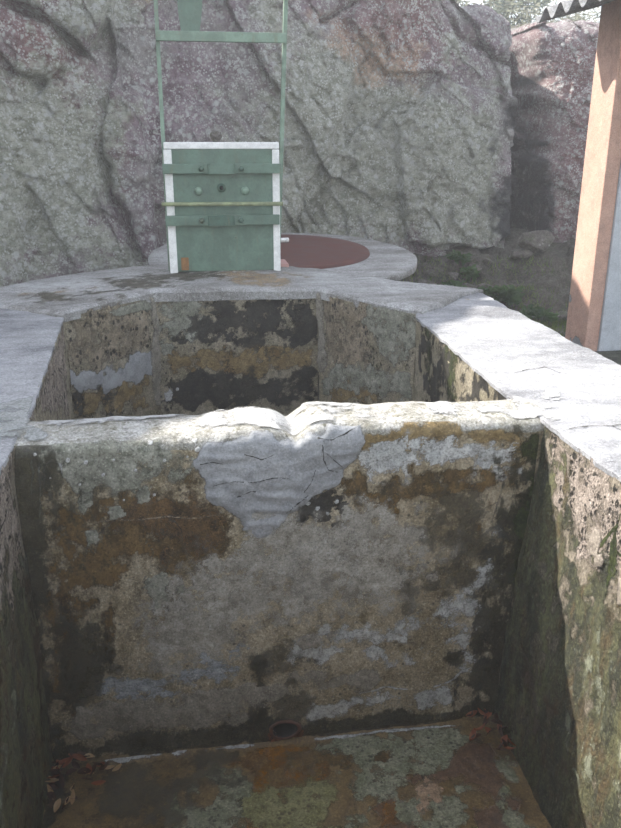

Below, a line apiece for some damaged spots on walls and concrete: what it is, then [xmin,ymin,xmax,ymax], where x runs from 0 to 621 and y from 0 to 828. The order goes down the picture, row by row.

leakage [560,453,580,551]
rust [45,468,234,663]
leakage [37,321,560,828]
leakage [591,551,619,585]
leakage [584,630,605,713]
leakage [572,744,595,785]